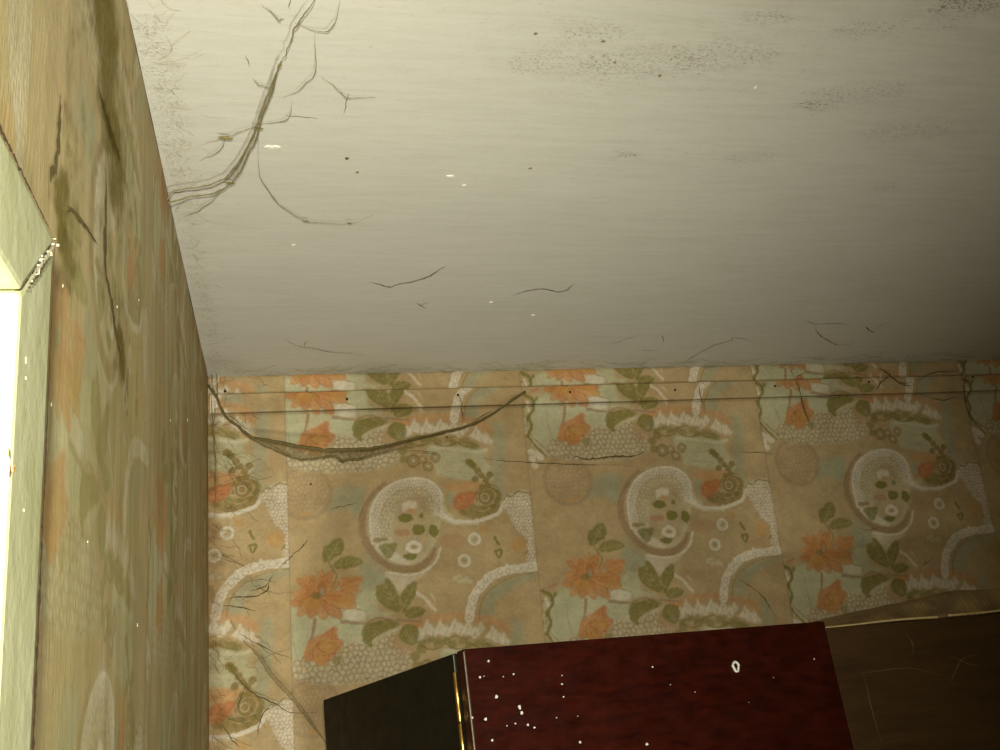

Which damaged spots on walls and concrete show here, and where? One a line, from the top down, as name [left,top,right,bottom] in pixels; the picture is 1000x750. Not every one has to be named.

crack [371,265,448,308]
crack [0,96,121,750]
crack [481,450,645,466]
crack [228,537,308,611]